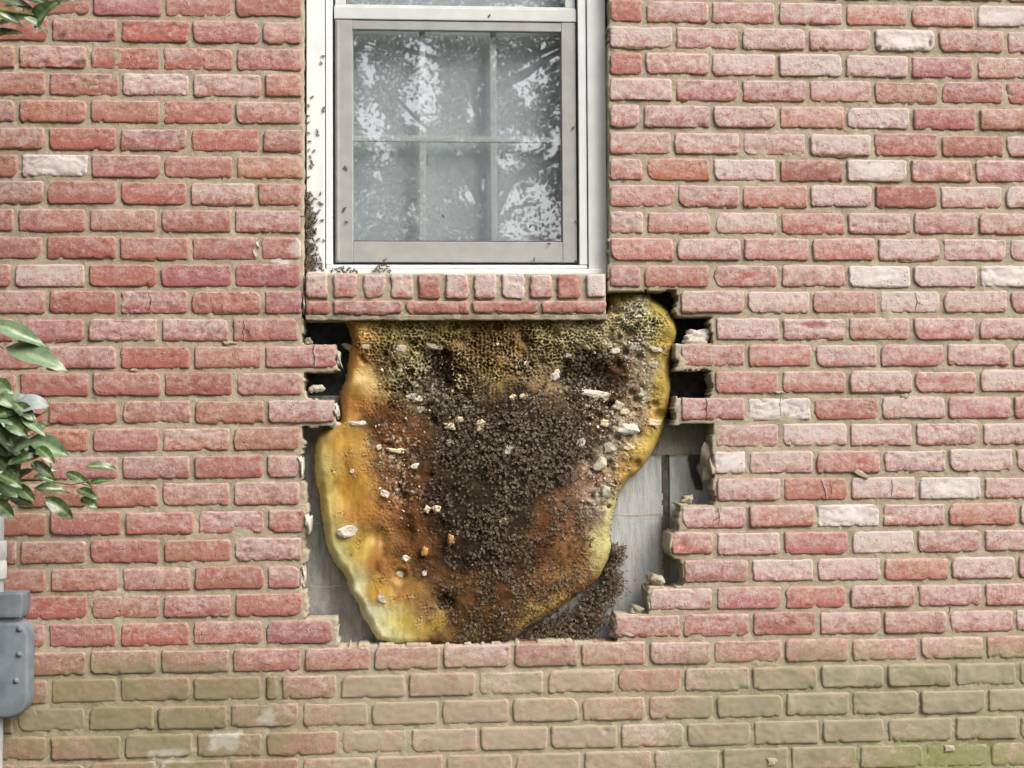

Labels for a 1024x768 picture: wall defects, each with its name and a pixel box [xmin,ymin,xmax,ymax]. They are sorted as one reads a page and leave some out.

spalling [609,342,663,369]
spalling [406,393,425,413]
spalling [332,420,366,428]
peeling [443,416,486,447]
spalling [590,400,661,472]
peeling [376,444,405,454]
spalling [601,485,611,498]
spalling [336,525,358,538]
peeling [396,546,429,578]